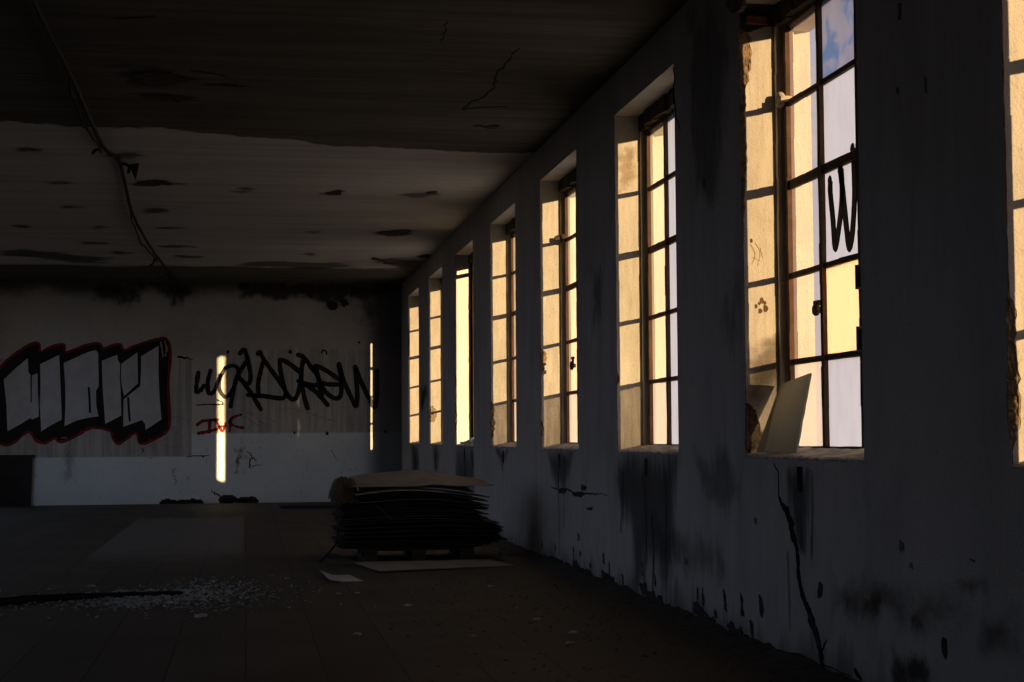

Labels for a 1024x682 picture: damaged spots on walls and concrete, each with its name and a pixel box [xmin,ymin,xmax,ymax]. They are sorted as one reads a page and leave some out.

flaking render [725,0,775,218]
spalling [1006,295,1021,447]
crack [552,484,607,510]
water stain [618,457,676,591]
crack [773,463,862,680]